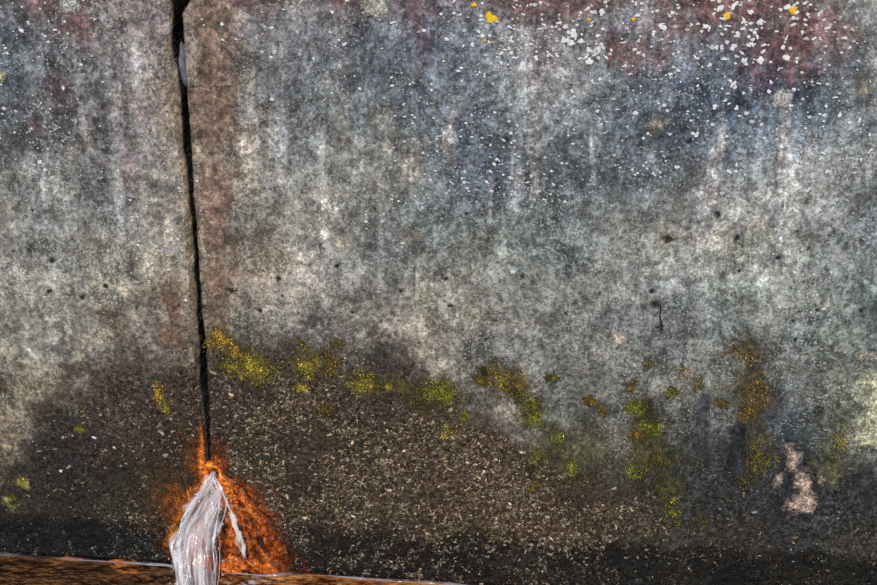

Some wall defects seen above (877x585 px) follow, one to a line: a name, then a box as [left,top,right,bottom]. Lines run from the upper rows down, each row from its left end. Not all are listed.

leakage [487,0,877,97]
leakage [117,138,180,238]
leakage [330,109,426,203]
leakage [442,114,457,176]
leakage [509,38,578,210]
leakage [589,124,598,173]
leakage [691,123,726,256]
leakage [760,106,814,293]
leakage [0,298,877,567]
rust [153,427,303,576]